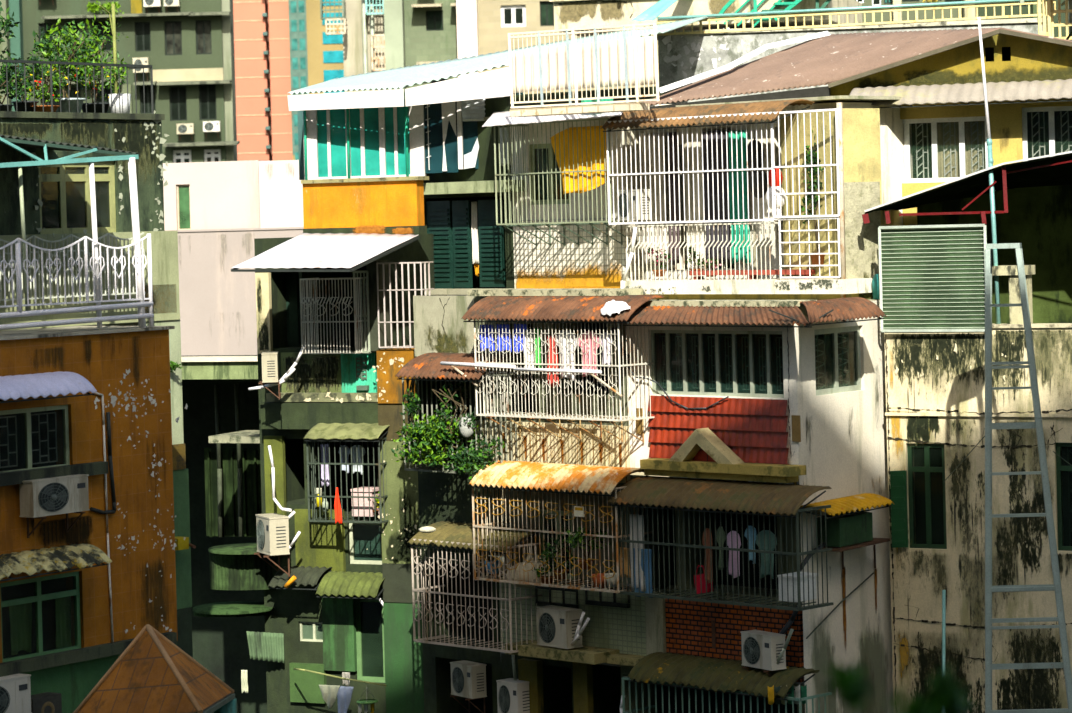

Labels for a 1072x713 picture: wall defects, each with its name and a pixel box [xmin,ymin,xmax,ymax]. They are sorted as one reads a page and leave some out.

spalling [144,110,170,231]
peeling [94,369,186,556]
leakage [892,330,1072,624]
leakage [906,628,1065,713]